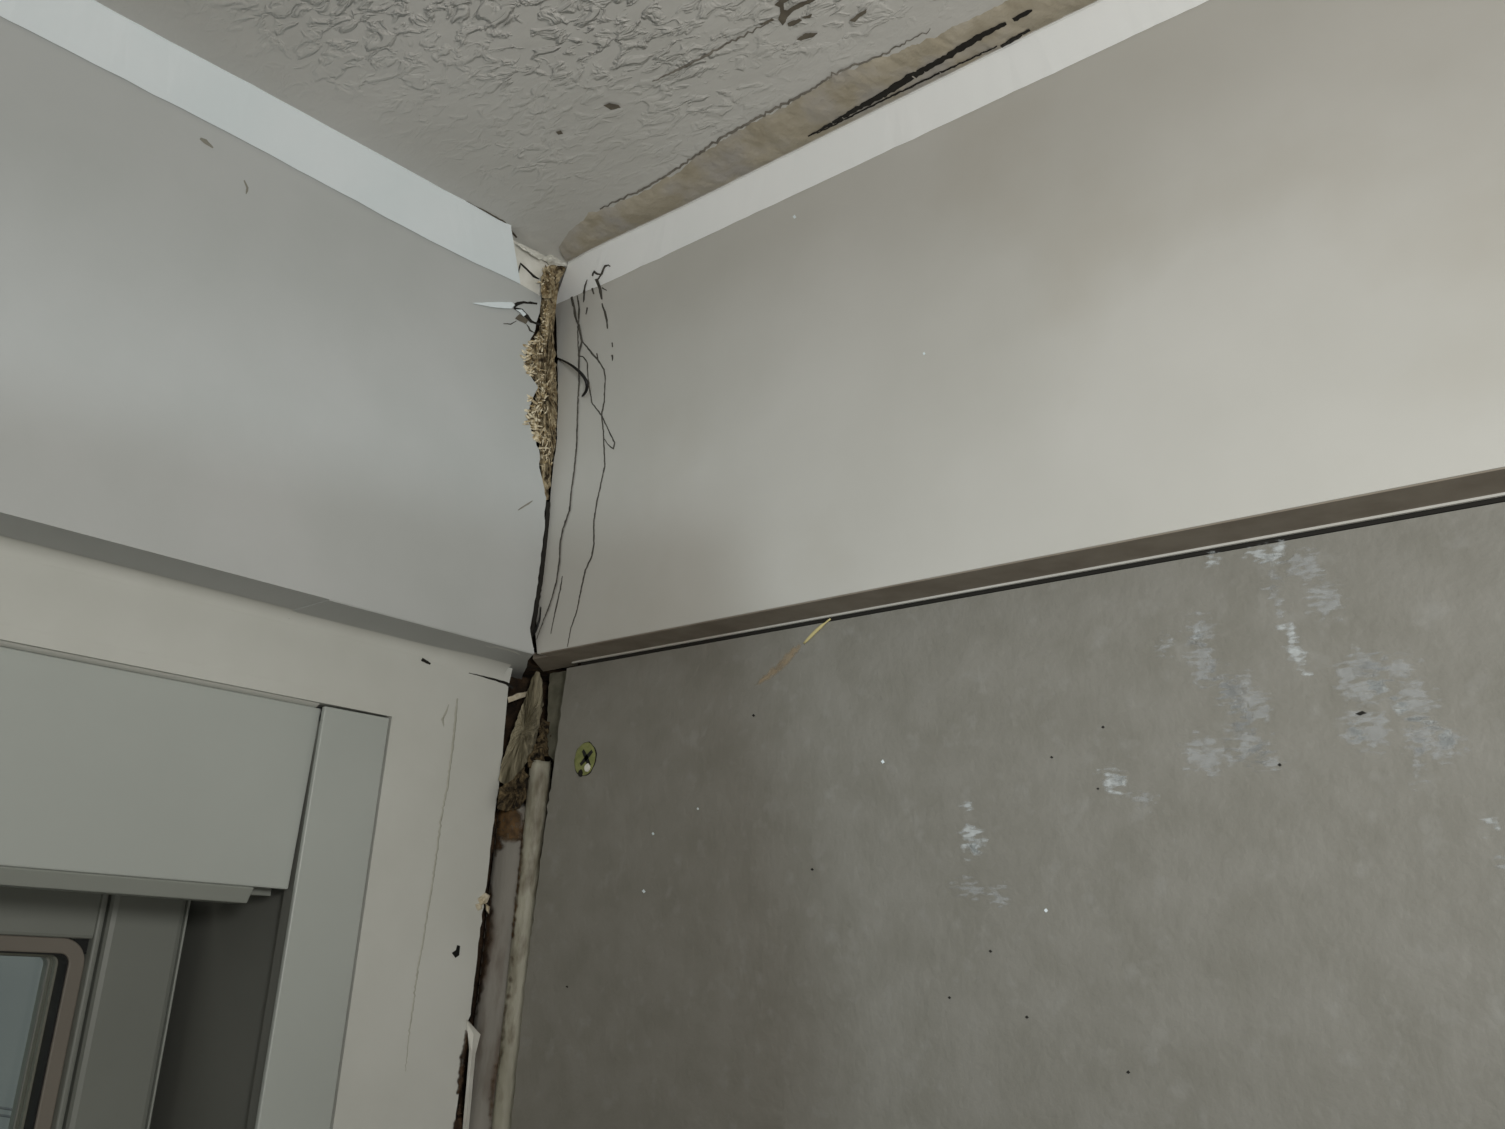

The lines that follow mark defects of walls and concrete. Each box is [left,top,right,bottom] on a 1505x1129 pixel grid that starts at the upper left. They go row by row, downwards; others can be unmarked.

peeling [759,0,817,41]
crack [600,9,1032,210]
crack [468,202,615,647]
leakage [1247,545,1284,563]
leakage [1278,625,1311,675]
spalling [497,718,554,811]
leakage [1104,773,1125,794]
peeling [475,893,490,914]